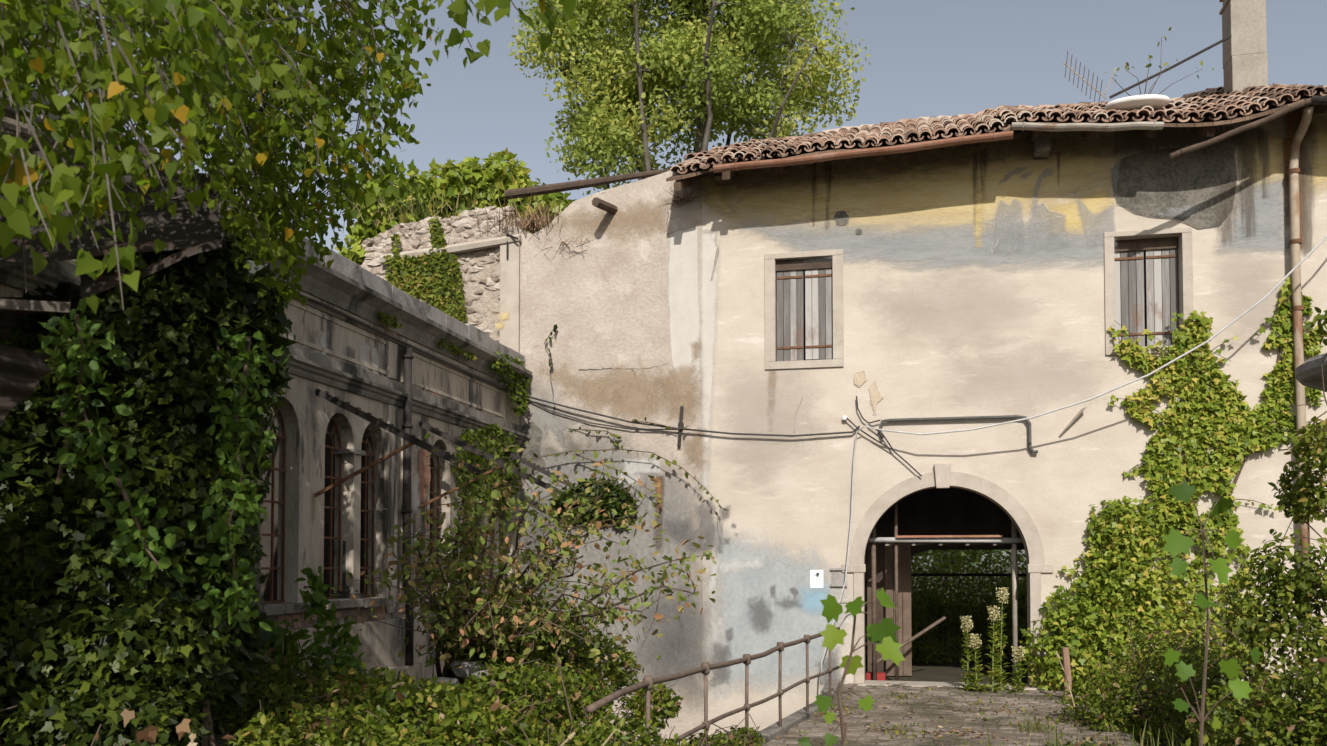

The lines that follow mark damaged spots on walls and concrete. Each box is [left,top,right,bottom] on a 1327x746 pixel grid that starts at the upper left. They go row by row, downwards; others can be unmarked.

water stain [735,135,1104,269]
peeling [721,136,1285,253]
water stain [1049,127,1288,250]
water stain [523,402,840,684]